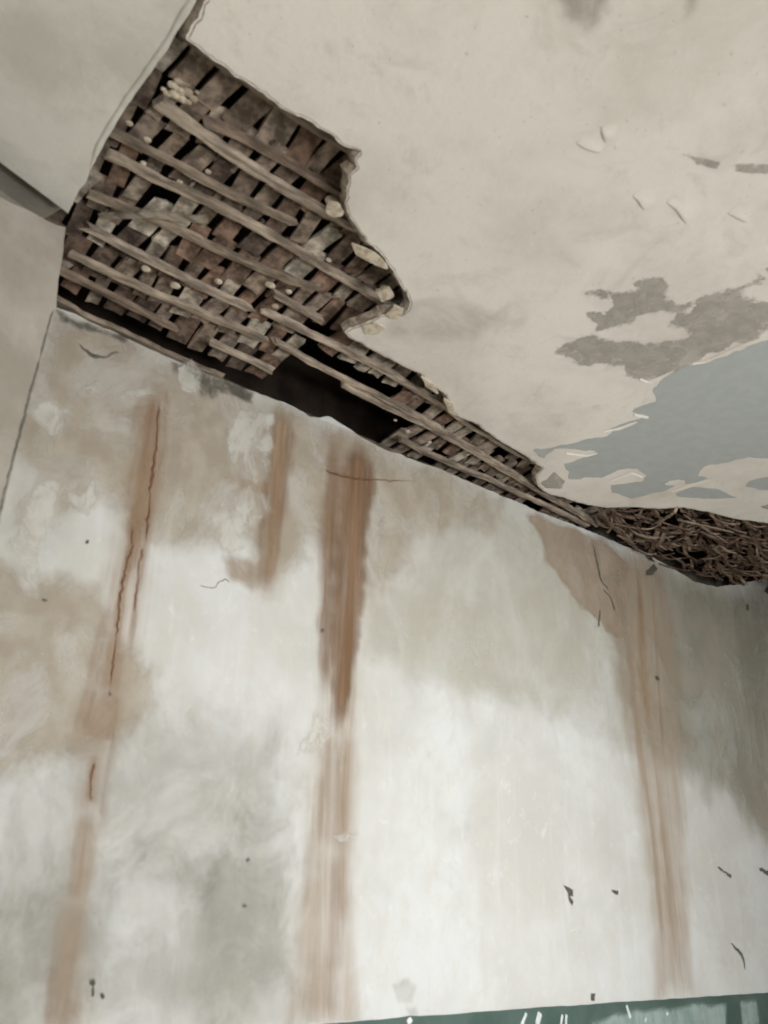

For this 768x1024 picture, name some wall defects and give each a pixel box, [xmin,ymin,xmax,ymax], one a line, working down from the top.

crack [110,409,160,683]
peeling [178,365,198,392]
peeling [213,411,273,552]
leakage [20,314,488,581]
flaking render [325,200,344,217]
flaking render [352,243,388,269]
flaking render [363,286,403,335]
flaking render [422,376,456,417]
peeling [533,278,768,499]
leakage [0,568,148,770]
leakage [529,515,768,830]
crack [88,764,96,799]